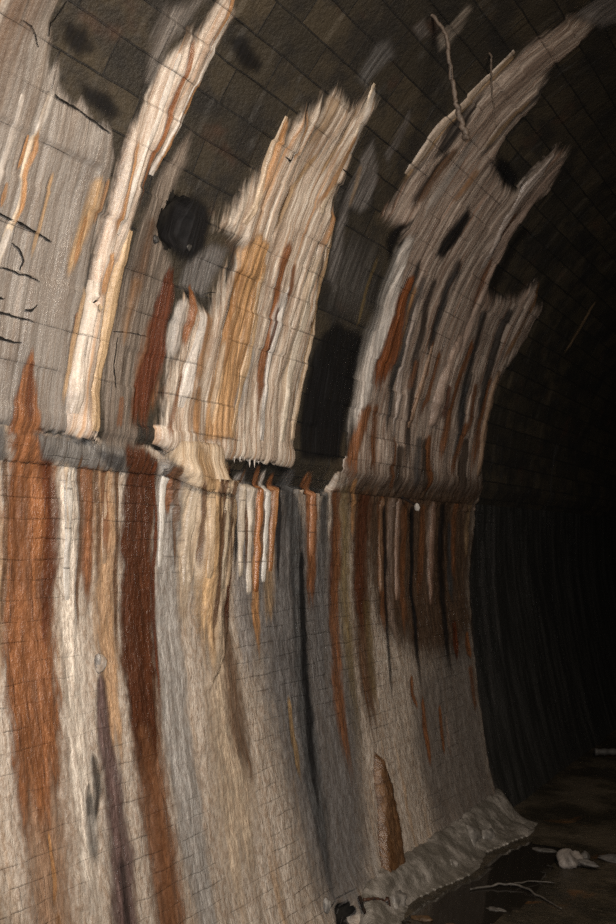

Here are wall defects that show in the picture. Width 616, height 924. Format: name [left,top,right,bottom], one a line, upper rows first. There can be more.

corrosion [1,351,72,924]